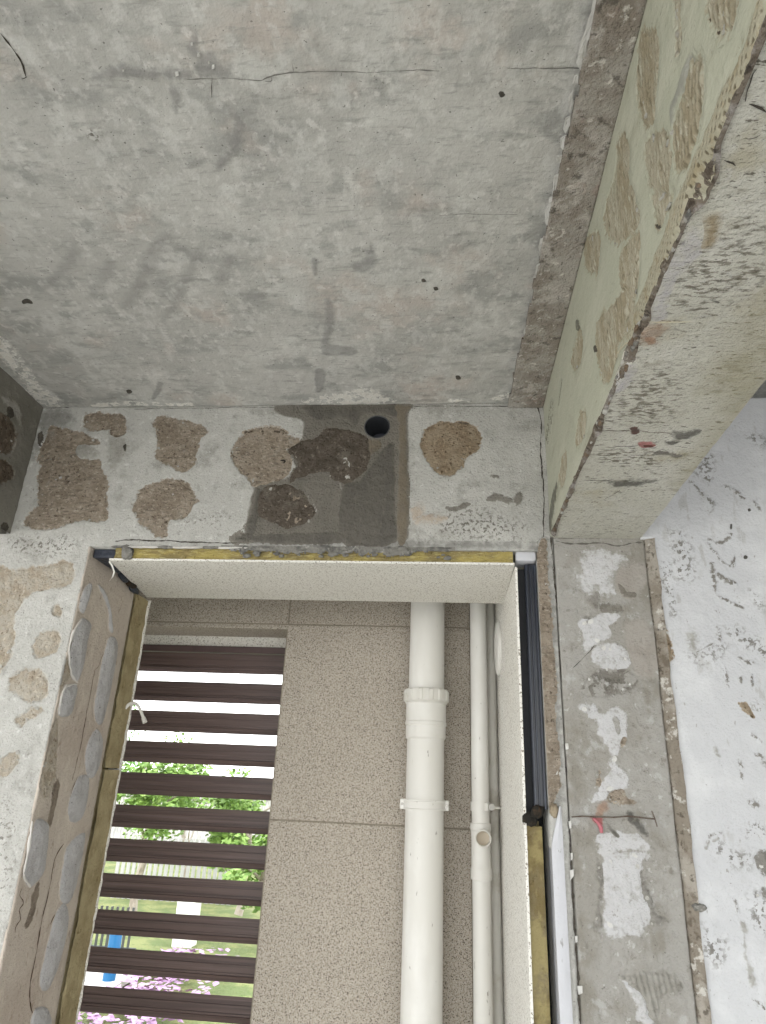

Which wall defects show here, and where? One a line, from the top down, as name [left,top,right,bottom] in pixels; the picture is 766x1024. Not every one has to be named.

crack [0,33,26,79]
crack [187,64,433,82]
spalling [417,0,766,809]
spalling [129,412,371,540]
spalling [0,409,129,932]